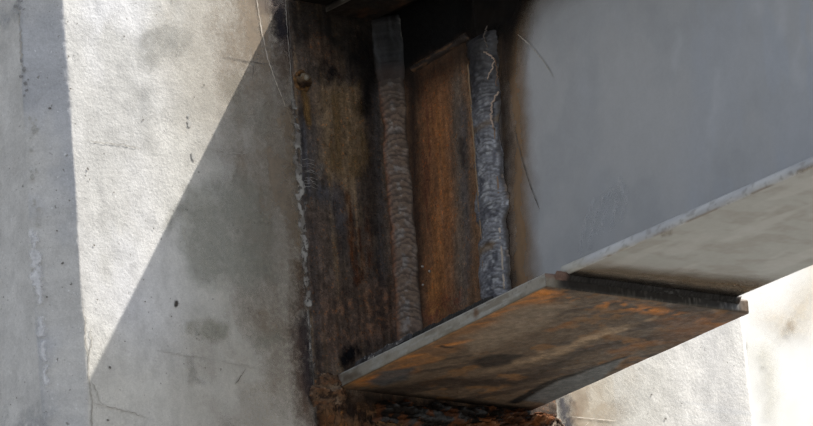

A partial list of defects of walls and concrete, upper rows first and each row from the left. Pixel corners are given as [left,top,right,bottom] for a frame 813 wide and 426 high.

damp [235,0,317,426]
crack [82,303,142,426]
corrosion [309,372,607,426]